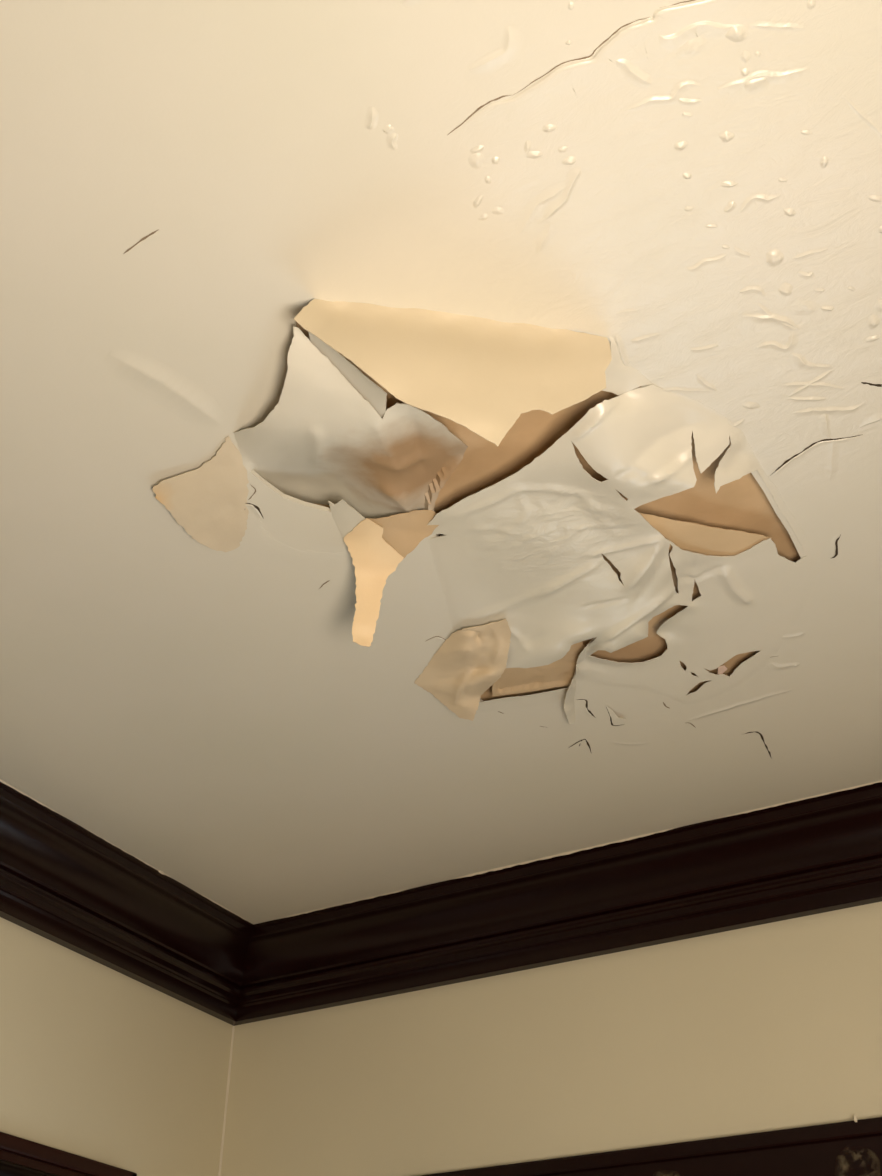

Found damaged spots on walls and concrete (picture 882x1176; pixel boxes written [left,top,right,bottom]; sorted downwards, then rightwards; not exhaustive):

peeling [153,299,817,724]
crack [569,699,620,754]
crack [741,732,772,760]